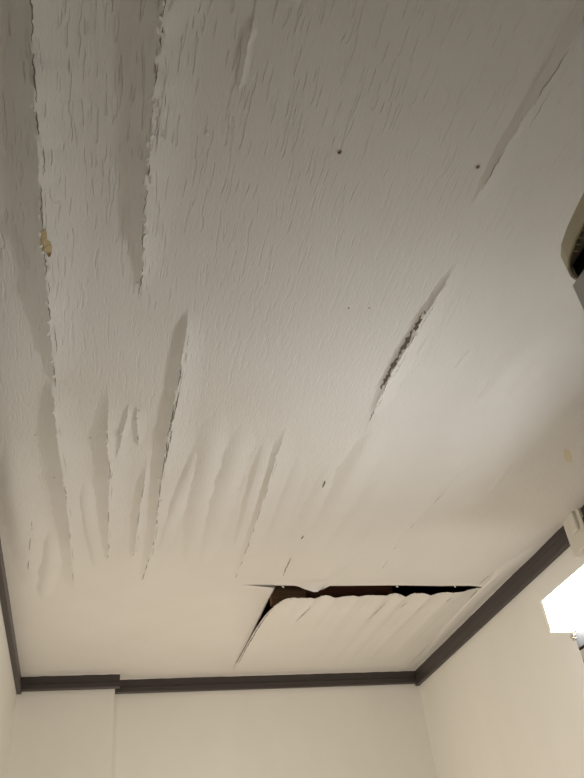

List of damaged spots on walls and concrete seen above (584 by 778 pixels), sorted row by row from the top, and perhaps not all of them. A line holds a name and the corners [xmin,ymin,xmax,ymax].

peeling [38,227,52,257]